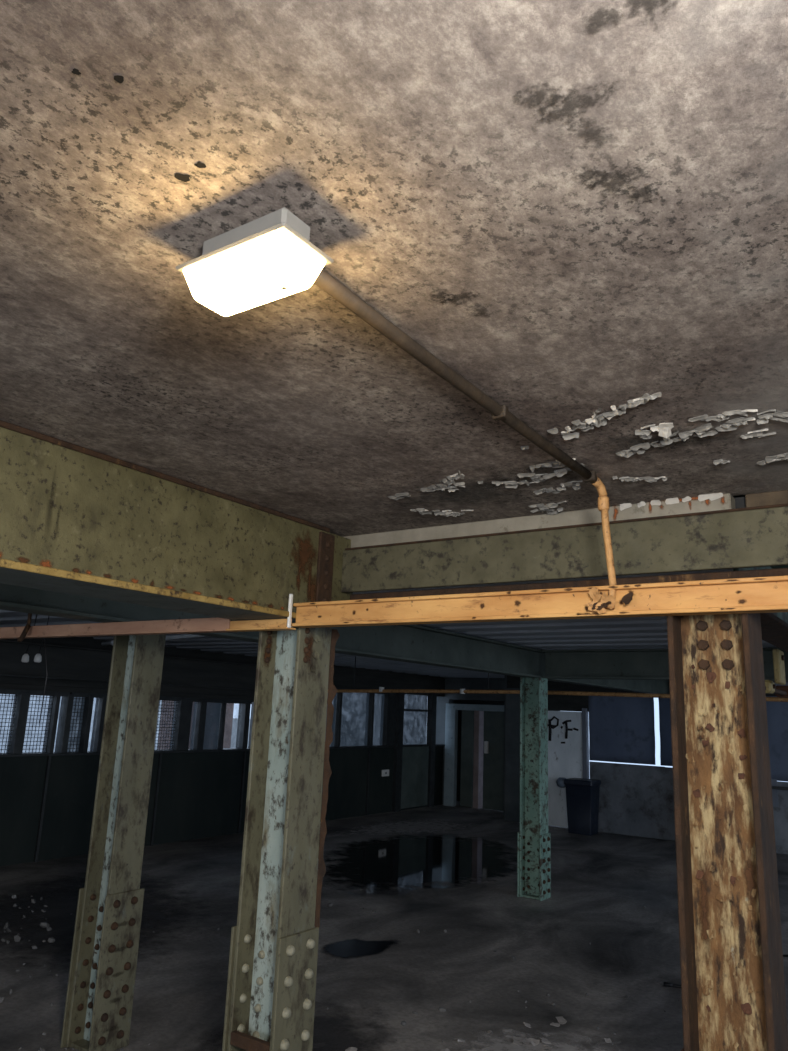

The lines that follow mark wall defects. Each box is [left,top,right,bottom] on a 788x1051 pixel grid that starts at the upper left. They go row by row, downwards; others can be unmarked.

peeling [388,458,585,517]
peeling [547,392,662,440]
spalling [613,493,725,520]
peeling [616,409,788,458]
peeling [756,453,788,465]
corrosion [292,534,317,604]
corrosion [686,703,747,827]
corrosion [696,848,757,943]
corrosion [724,950,763,1051]